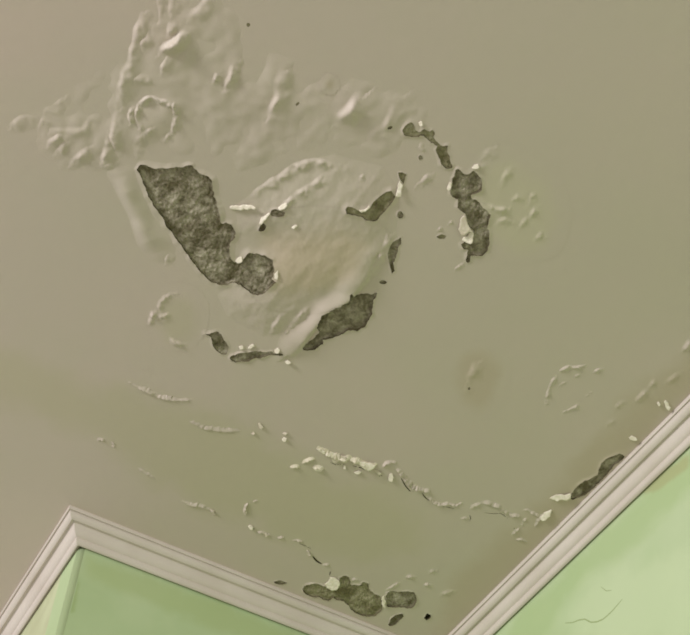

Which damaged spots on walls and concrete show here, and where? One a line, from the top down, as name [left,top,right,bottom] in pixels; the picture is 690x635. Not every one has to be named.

spalling [134,160,278,301]
spalling [258,203,287,232]
spalling [340,171,408,223]
spalling [388,118,491,265]
spalling [302,235,403,352]
spalling [203,329,291,365]
spalling [550,454,626,502]
spalling [301,575,418,627]